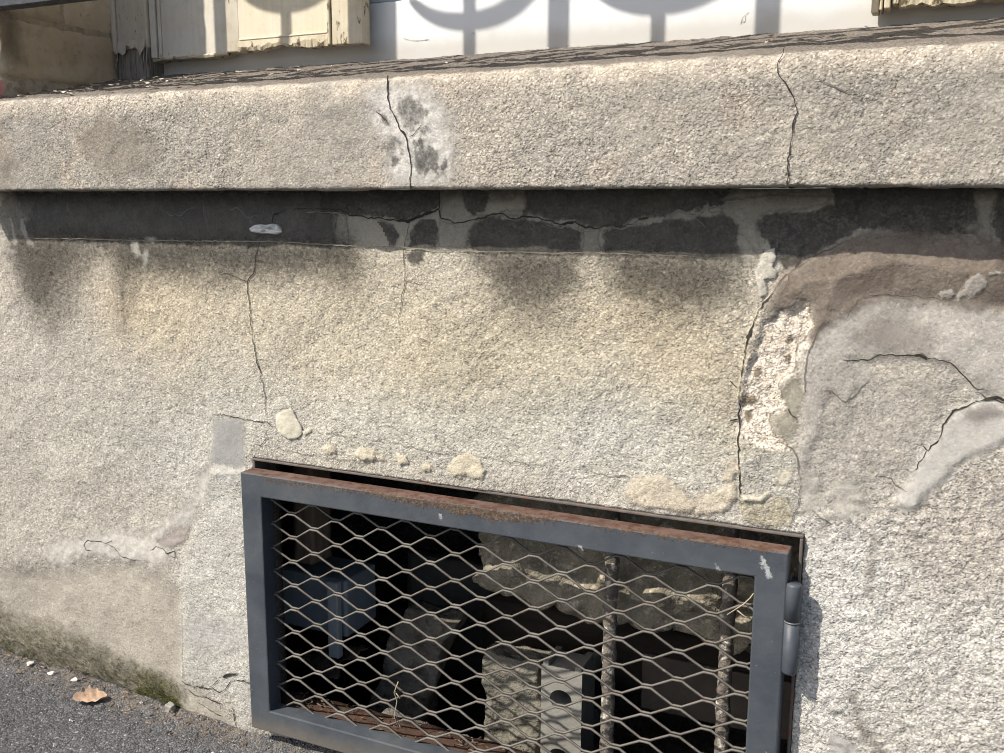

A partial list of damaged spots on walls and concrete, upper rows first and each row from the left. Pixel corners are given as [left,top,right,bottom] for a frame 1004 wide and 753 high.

crack [376,75,422,189]
crack [777,48,798,184]
water stain [0,193,86,315]
water stain [406,250,423,264]
crack [205,192,648,468]
water stain [437,190,528,248]
water stain [623,259,723,299]
peeling [755,248,777,297]
spalling [740,300,814,451]
crack [730,233,869,497]
crack [785,330,1004,492]
peeling [939,271,1004,301]